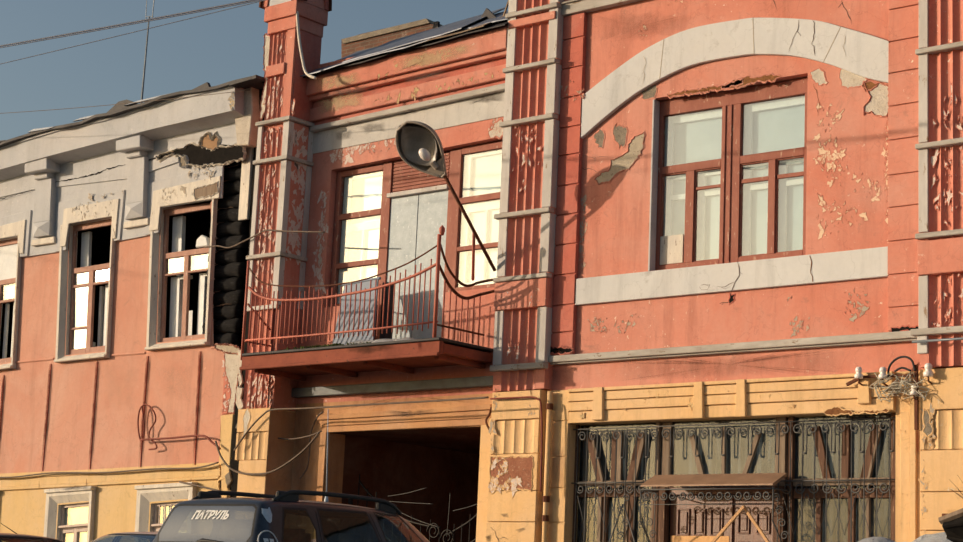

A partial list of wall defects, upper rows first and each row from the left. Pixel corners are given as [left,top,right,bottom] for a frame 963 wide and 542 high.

spalling [641,72,782,101]
peeling [932,82,963,132]
crack [56,165,123,182]
spalling [155,33,329,297]
spalling [593,123,647,186]
spalling [809,67,889,245]
peeling [931,144,963,226]
peeling [579,193,589,271]
peeling [931,273,963,334]
spalling [214,343,275,440]
spalling [487,389,535,499]
spalling [822,406,890,417]